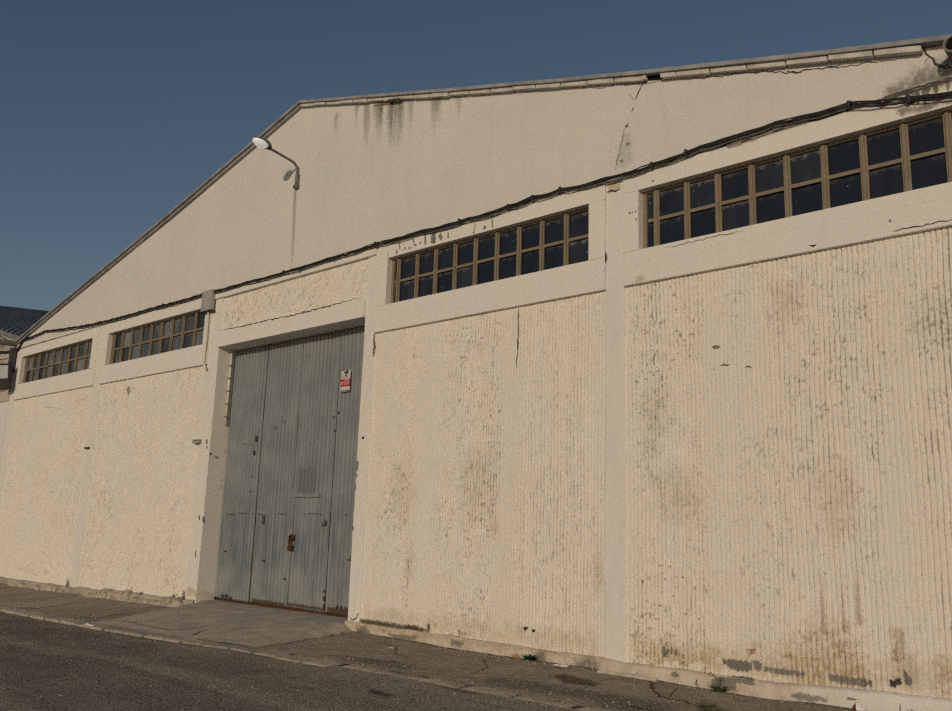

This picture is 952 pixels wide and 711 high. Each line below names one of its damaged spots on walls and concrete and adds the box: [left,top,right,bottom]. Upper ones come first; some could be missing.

crack [574,60,890,169]
crack [513,309,521,367]
leakage [360,619,430,634]